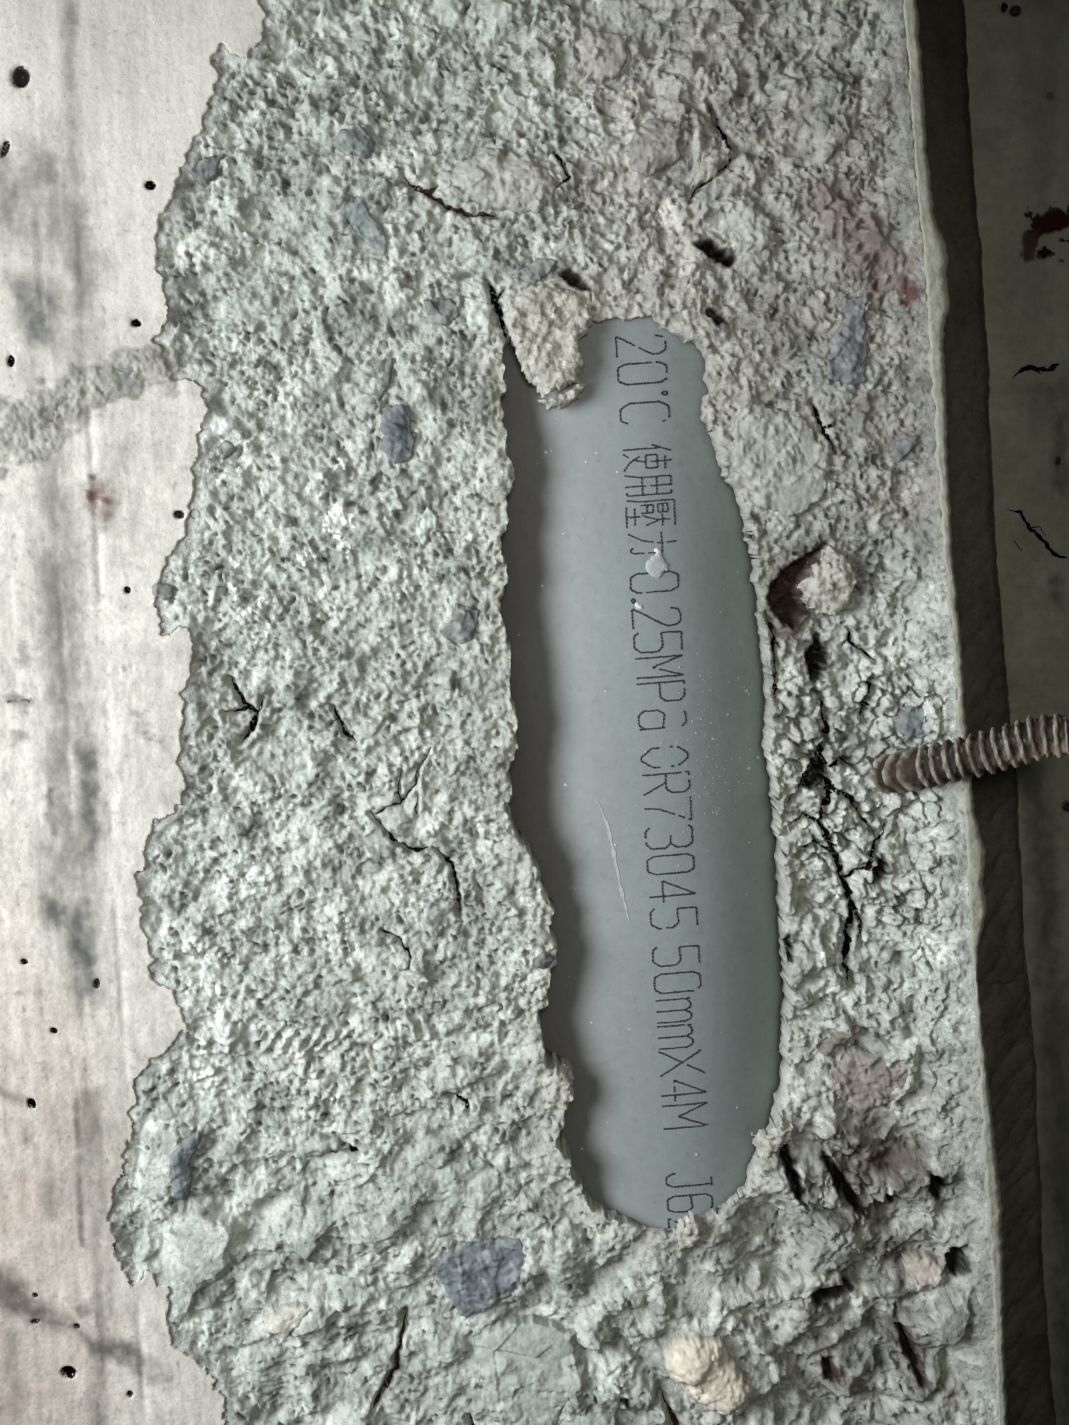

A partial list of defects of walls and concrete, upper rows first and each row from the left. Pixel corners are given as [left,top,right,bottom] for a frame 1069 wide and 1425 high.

rust [1020,205,1069,262]
spalling [506,283,594,410]
spalling [731,403,831,517]
crack [224,677,263,741]
crack [370,748,460,912]
crack [786,628,885,982]
damp [47,902,92,969]
damp [0,1276,46,1319]
damp [90,1343,135,1357]
crack [370,1307,406,1413]
spalling [474,1314,578,1425]
spalling [663,1333,753,1415]